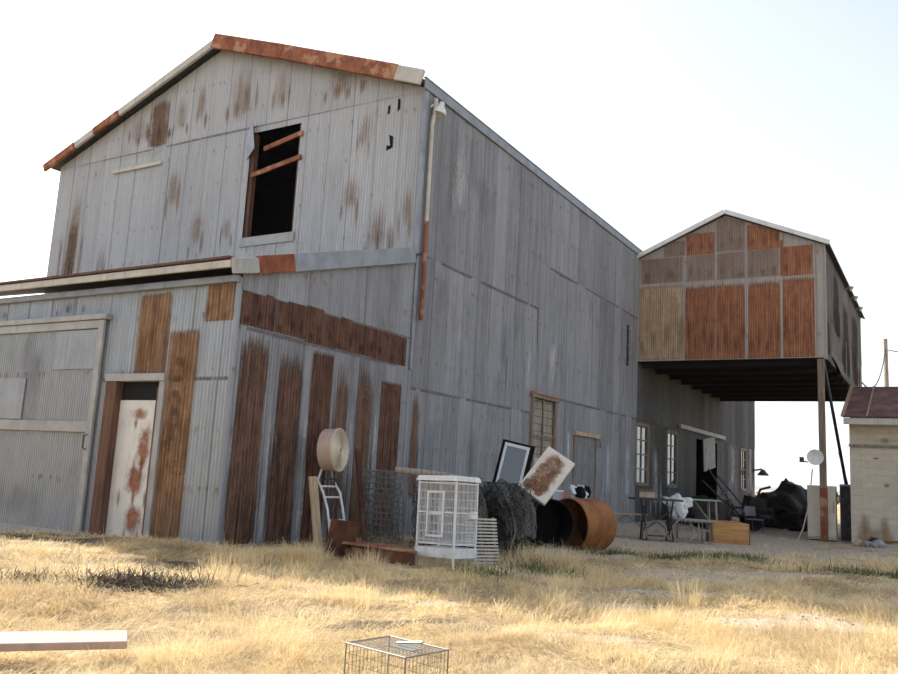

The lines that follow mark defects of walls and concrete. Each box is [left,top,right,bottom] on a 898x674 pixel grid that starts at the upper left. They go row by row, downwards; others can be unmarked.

rust [146,101,174,147]
rust [640,218,815,360]
rust [827,280,860,385]
rust [123,292,199,541]
rust [205,283,407,546]
rust [408,401,418,497]